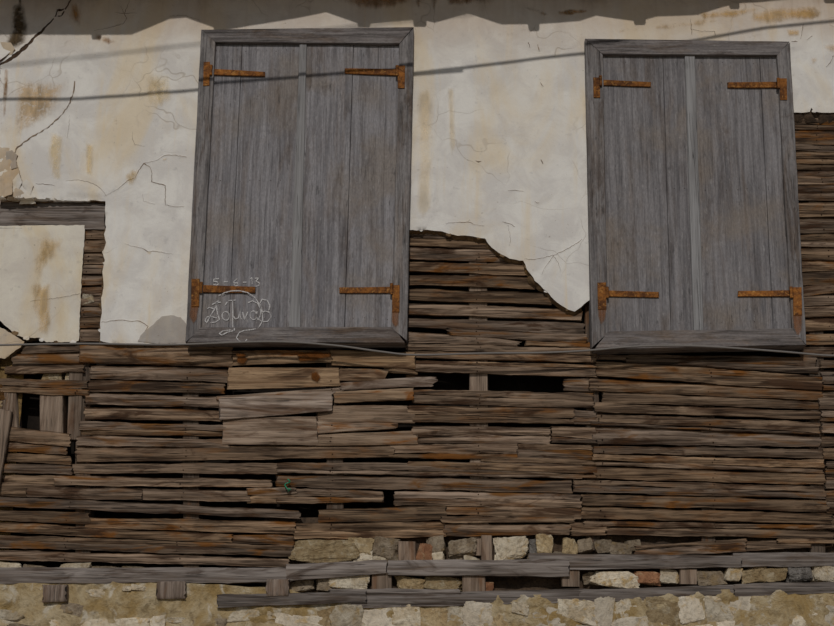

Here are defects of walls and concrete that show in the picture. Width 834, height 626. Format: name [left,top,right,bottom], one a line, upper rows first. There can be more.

damp [9,0,26,46]
crack [0,0,74,86]
crack [169,13,200,21]
spalling [794,109,834,124]
crack [36,132,187,208]
spalling [409,230,582,315]
spalling [0,321,80,346]
flaking render [98,315,186,348]